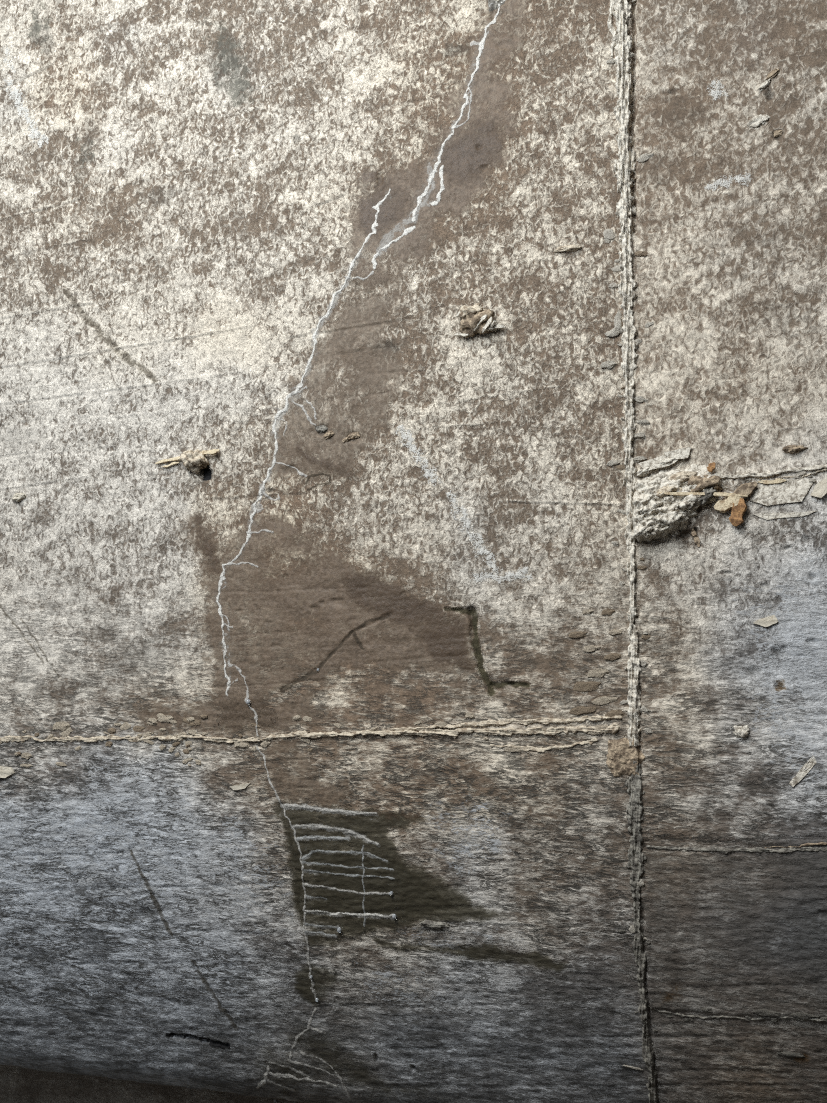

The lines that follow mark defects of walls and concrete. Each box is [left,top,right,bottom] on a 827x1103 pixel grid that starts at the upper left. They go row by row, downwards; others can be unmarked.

damp [142,516,476,735]
crack [216,0,505,999]
spalling [632,447,827,547]
damp [269,742,563,1017]